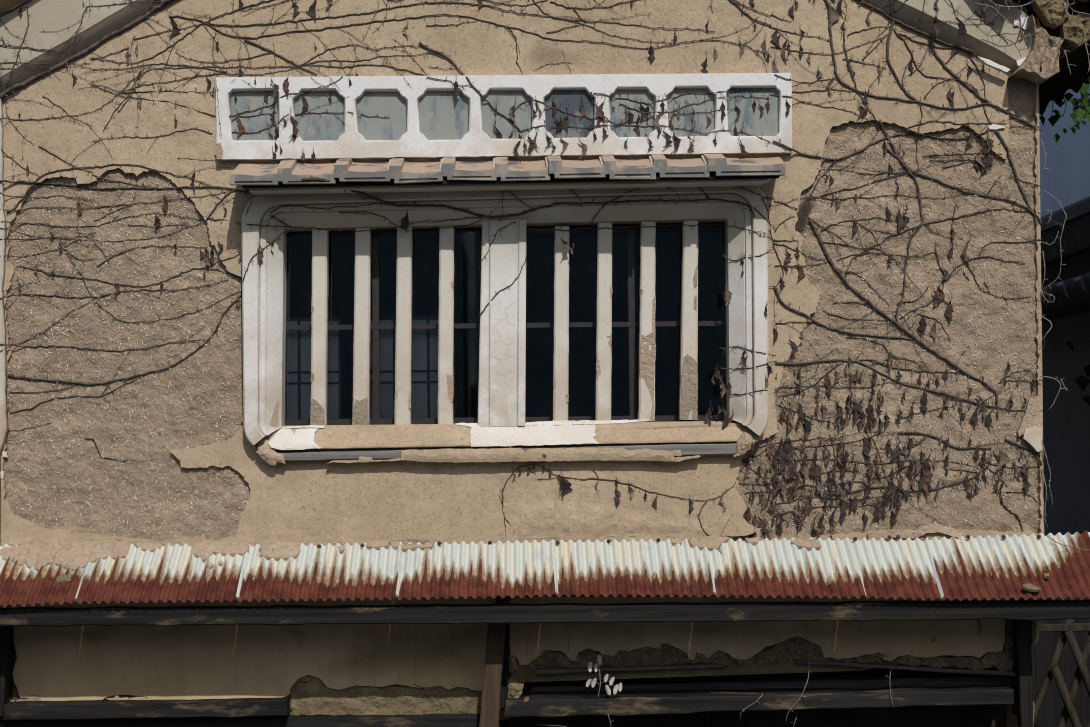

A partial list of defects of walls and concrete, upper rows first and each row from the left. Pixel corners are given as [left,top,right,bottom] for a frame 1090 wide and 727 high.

flaking render [977,17,1033,73]
flaking render [76,176,97,185]
flaking render [268,398,325,450]
flaking render [352,397,369,425]
flaking render [455,289,656,447]
flaking render [681,354,698,420]
flaking render [1017,395,1043,452]
corrosion [0,531,1090,607]
spalling [508,619,1014,702]
spalling [290,675,482,716]